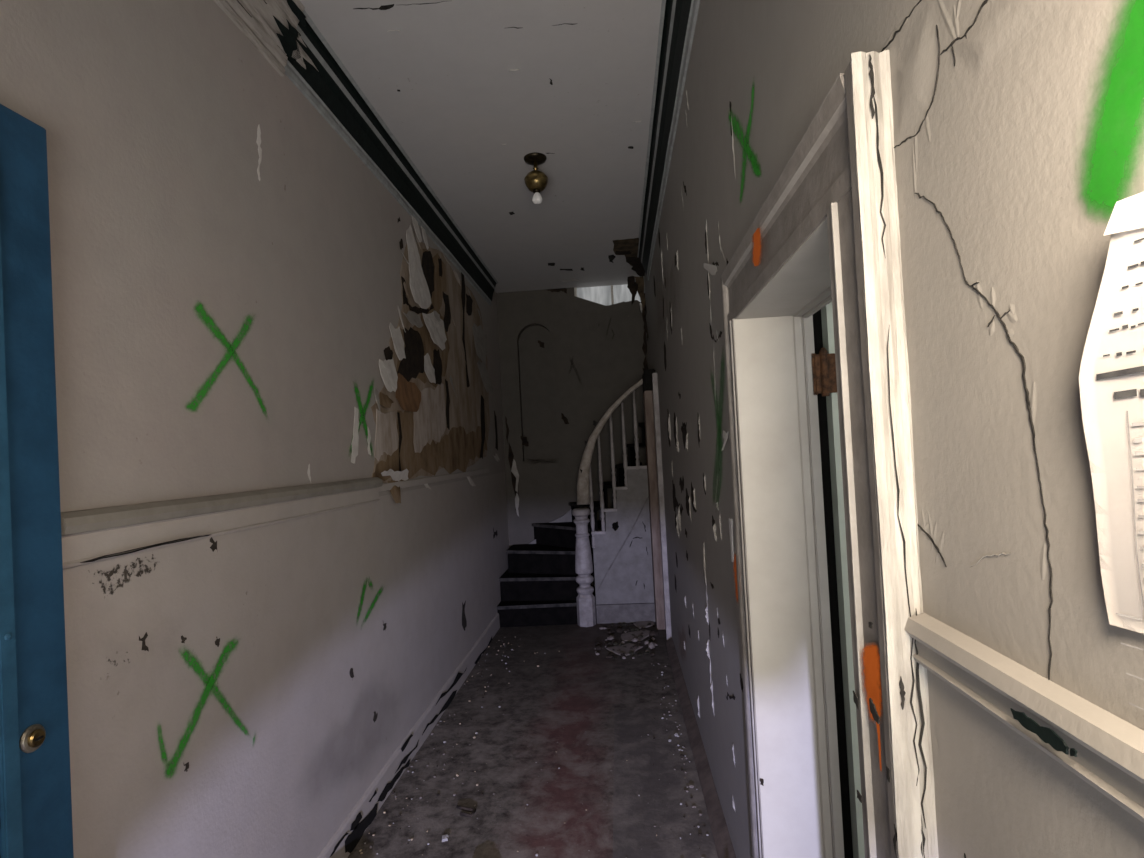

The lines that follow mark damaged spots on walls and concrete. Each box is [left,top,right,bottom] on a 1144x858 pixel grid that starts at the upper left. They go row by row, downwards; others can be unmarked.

peeling [273,0,319,72]
peeling [351,215,529,516]
peeling [546,263,642,314]
peeling [608,232,683,371]
peeling [667,409,701,453]
crack [869,0,1053,680]
peeling [672,465,743,718]
crack [887,325,947,858]
peeling [1010,708,1078,757]